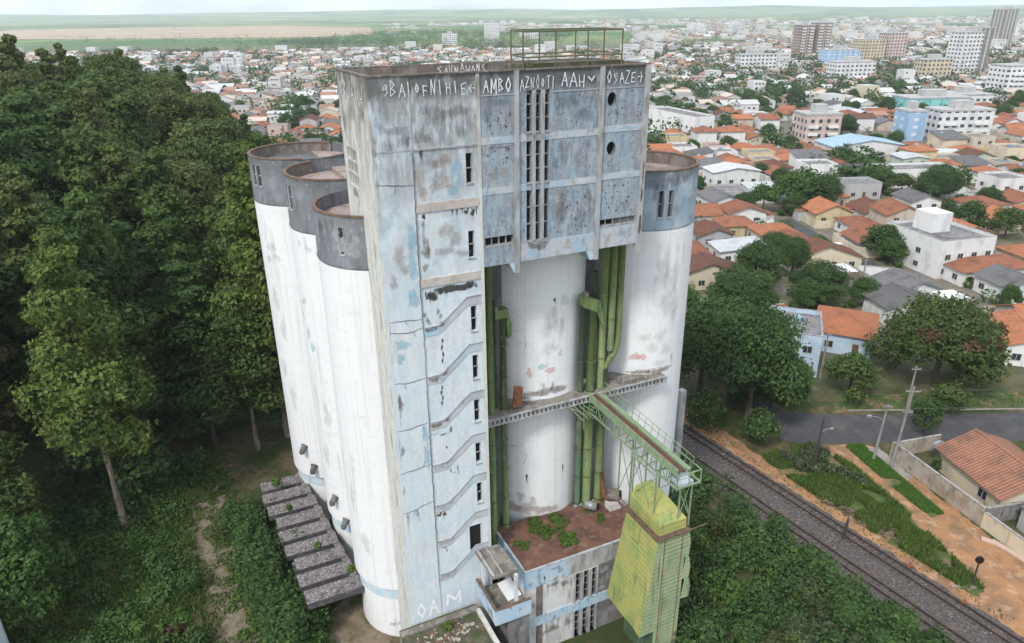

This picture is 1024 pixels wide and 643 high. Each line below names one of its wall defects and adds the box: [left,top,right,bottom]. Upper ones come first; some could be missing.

crack [368,156,447,585]